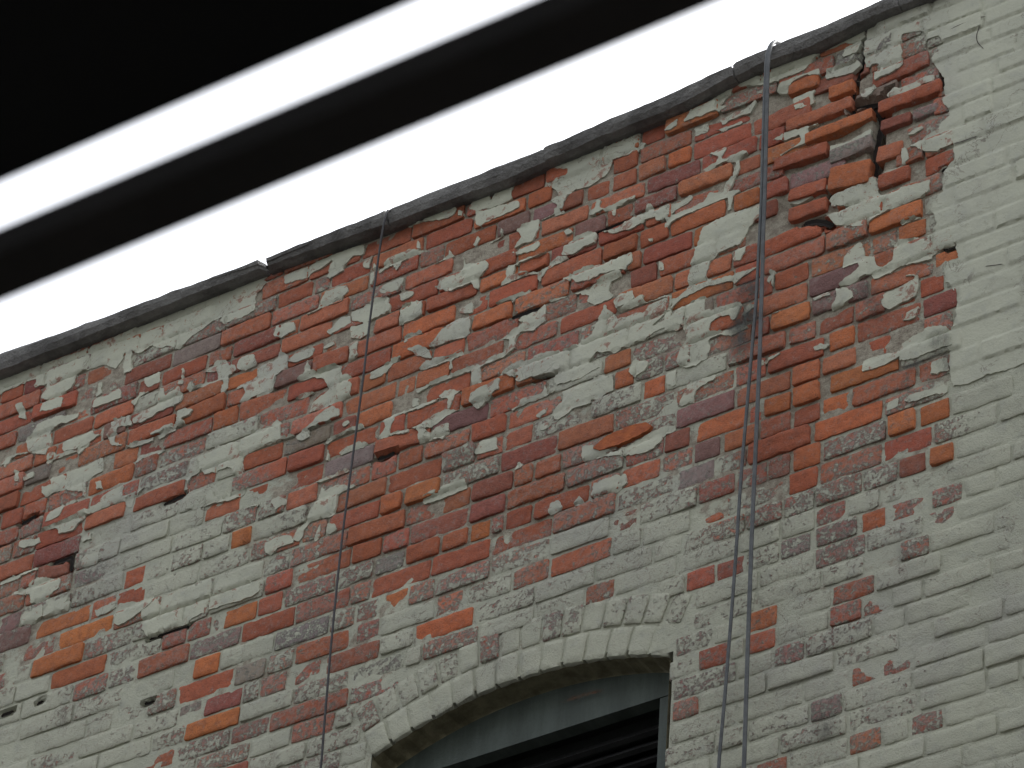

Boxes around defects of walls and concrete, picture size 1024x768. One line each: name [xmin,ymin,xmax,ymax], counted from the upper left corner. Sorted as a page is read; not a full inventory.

peeling [773,123,820,156]
peeling [664,6,935,136]
crack [852,46,885,178]
peeling [826,124,954,227]
peeling [814,225,956,321]
peeling [0,134,759,568]
peeling [862,325,952,411]
peeling [0,567,71,627]
peeling [95,576,260,638]